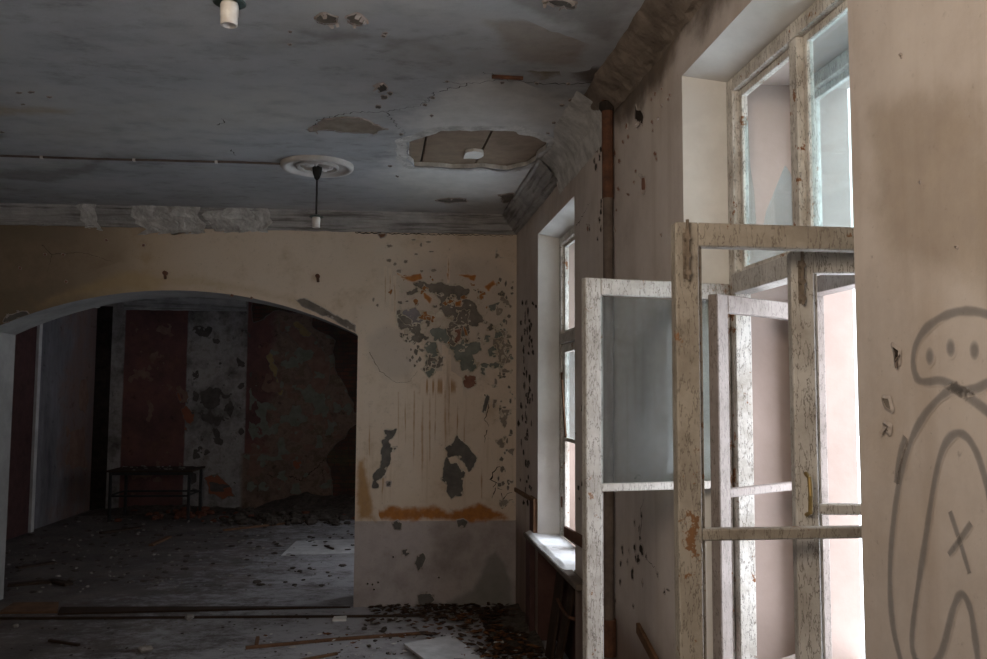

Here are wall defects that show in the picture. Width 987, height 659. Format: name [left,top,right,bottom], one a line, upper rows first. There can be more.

peeling [314,12,369,29]
spalling [307,96,556,178]
peeling [176,357,252,459]
flaking render [241,298,358,496]
peeling [371,428,398,489]
peeling [377,233,538,508]